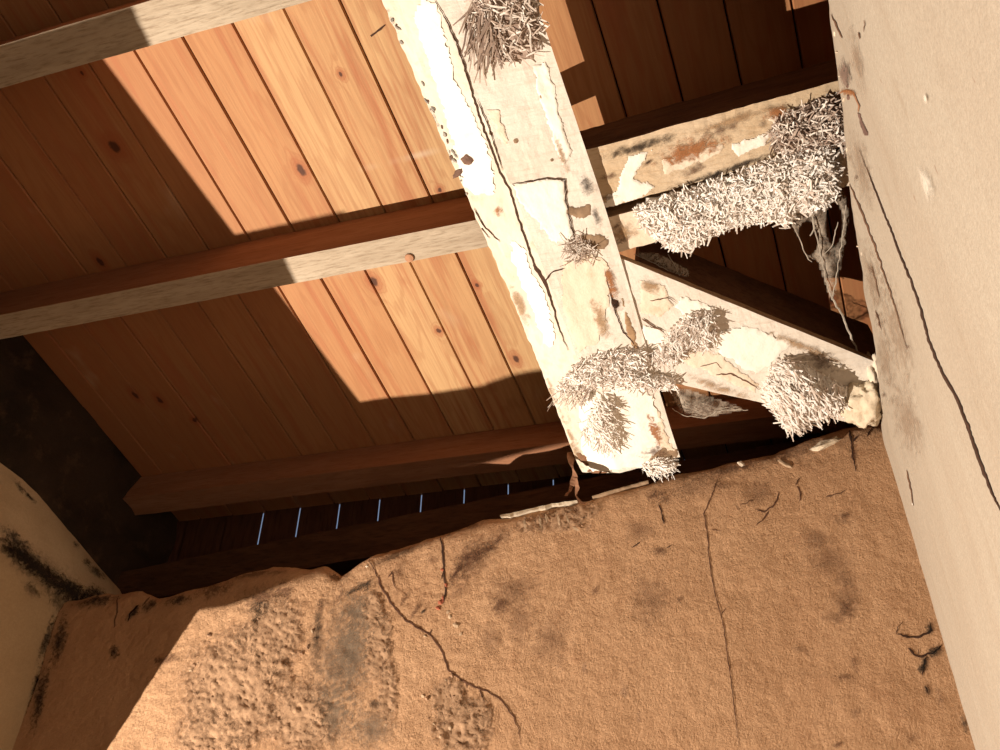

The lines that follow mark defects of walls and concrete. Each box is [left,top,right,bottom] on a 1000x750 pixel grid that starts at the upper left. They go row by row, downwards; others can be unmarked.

peeling [567,204,591,219]
peeling [582,234,608,251]
peeling [621,298,637,349]
crack [849,150,1000,510]
peeling [576,453,607,473]
peeling [648,448,678,461]
damp [5,532,109,609]
crack [703,475,739,745]
damp [39,621,66,657]
crack [365,537,521,744]
crack [896,623,942,693]
damp [30,668,49,723]